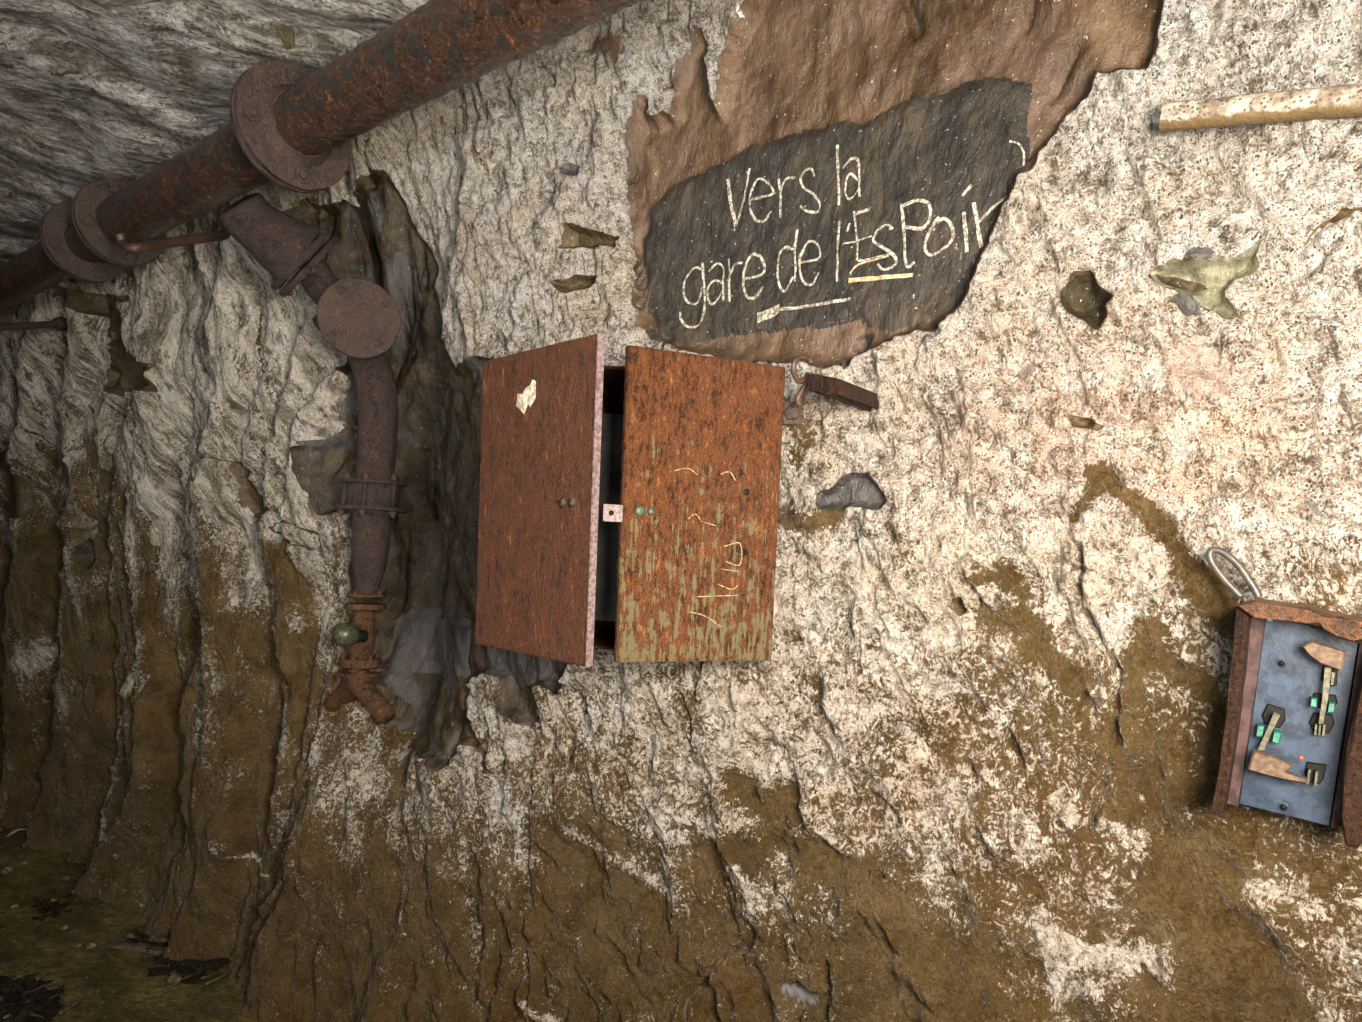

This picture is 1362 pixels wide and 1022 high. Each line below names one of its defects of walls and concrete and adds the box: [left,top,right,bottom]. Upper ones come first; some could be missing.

spalling [549,274,596,293]
peeling [558,0,1163,369]
peeling [283,169,567,774]